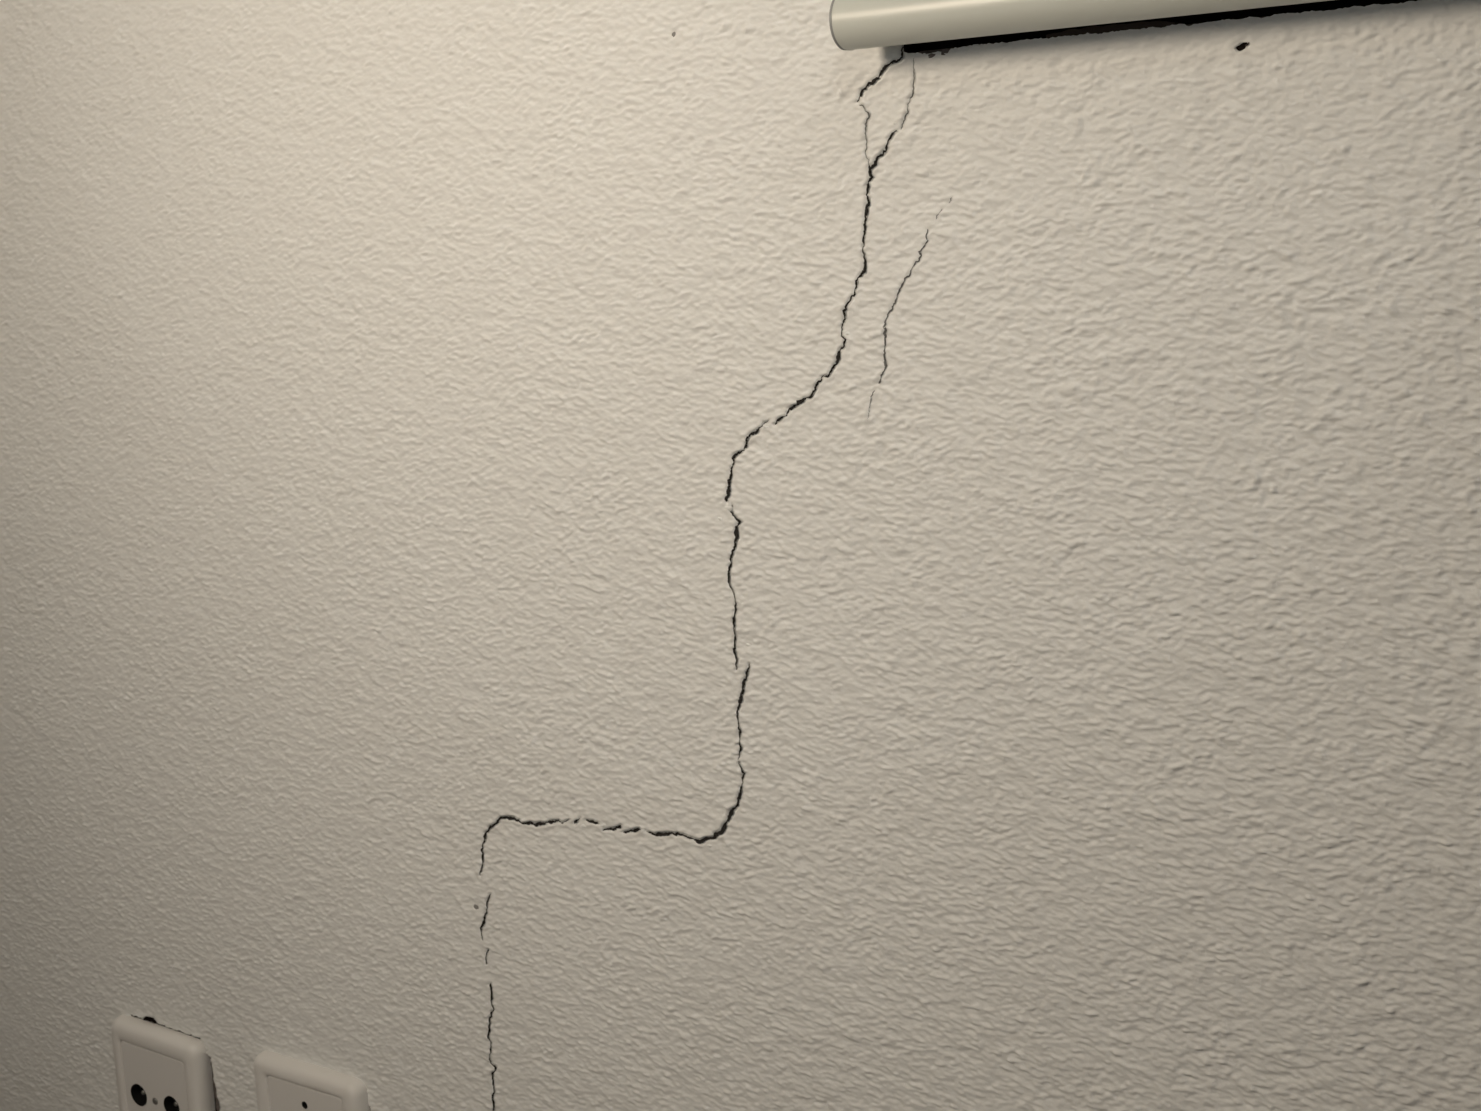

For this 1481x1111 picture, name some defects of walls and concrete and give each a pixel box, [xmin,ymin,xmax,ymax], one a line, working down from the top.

crack [479,44,951,1111]